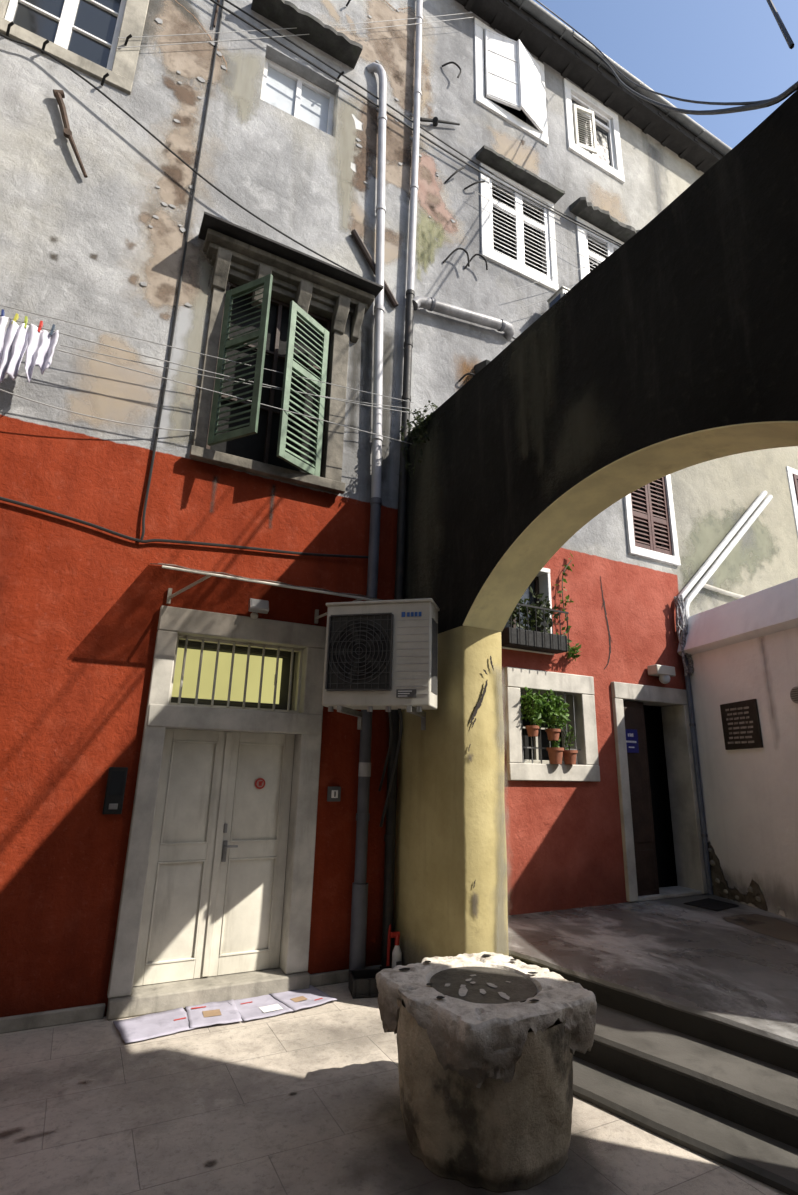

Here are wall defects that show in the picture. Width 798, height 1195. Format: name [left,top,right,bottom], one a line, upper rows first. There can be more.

flaking render [129,0,227,319]
flaking render [336,0,458,262]
spalling [708,841,768,911]